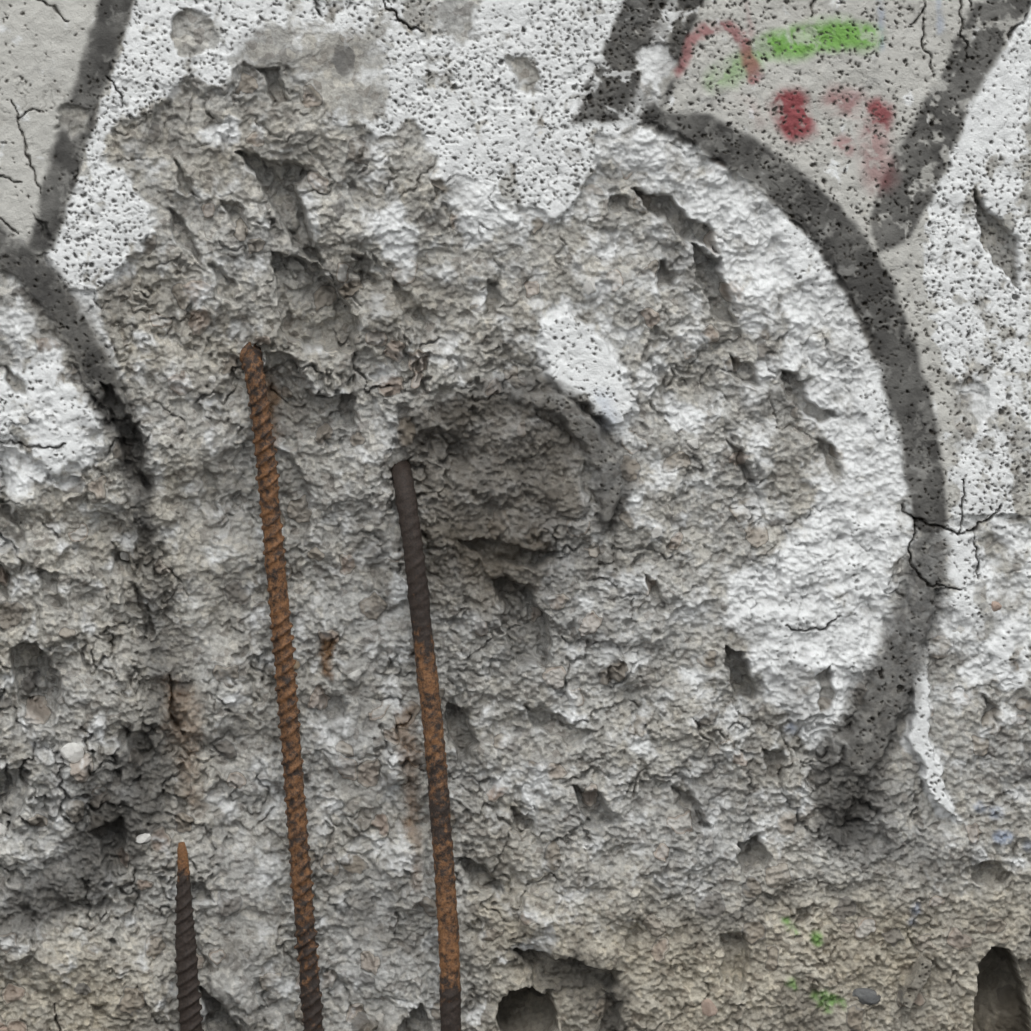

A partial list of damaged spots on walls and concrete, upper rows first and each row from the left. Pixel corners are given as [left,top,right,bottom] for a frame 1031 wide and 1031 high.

crack [106,76,124,107]
peeling [506,56,542,95]
peeling [635,44,682,108]
crack [0,100,42,195]
spalling [399,119,910,694]
spalling [0,9,480,1031]
crack [901,480,1003,591]
spalling [263,351,1031,1031]